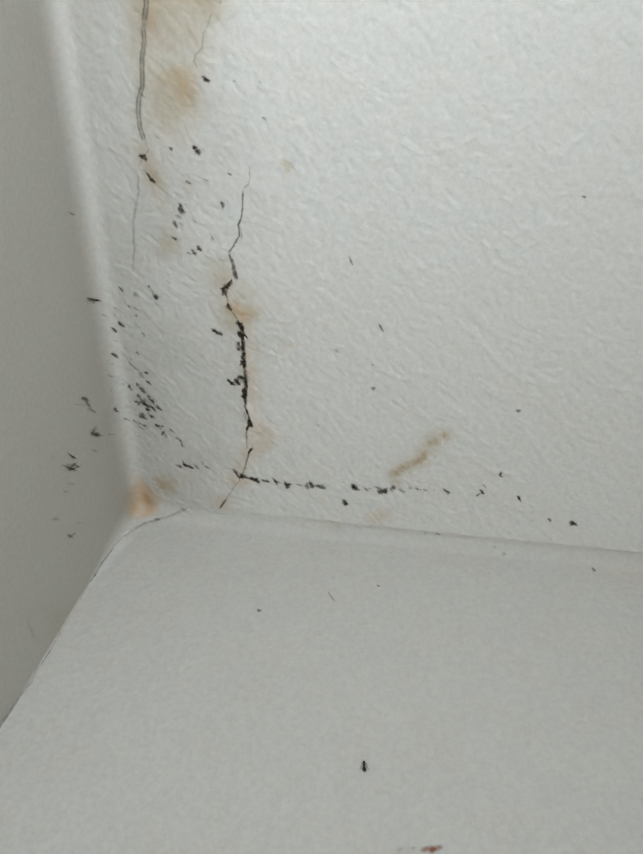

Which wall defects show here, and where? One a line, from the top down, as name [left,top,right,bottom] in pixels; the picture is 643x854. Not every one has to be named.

leakage [111,0,291,514]
crack [220,194,253,457]
leakage [351,419,463,494]